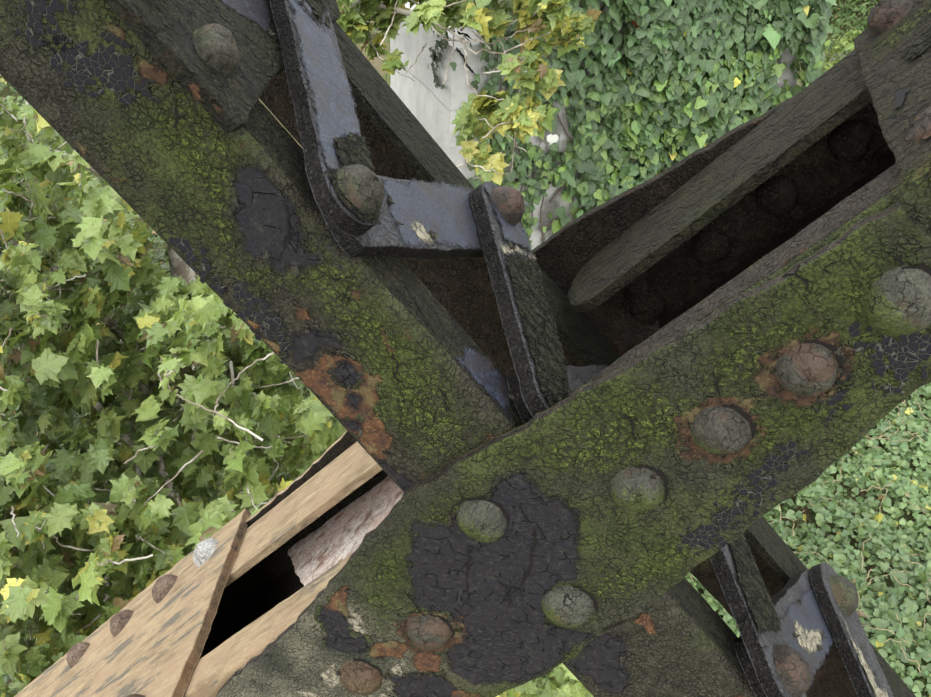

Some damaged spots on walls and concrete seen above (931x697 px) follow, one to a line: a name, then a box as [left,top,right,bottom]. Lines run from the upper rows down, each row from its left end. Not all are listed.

corrosion [752,327,857,407]
corrosion [296,351,393,460]
corrosion [673,396,767,464]
peeling [319,663,341,688]
corrosion [325,586,351,619]
peeling [314,596,371,654]
corrosion [365,611,467,677]
peeling [380,469,632,697]